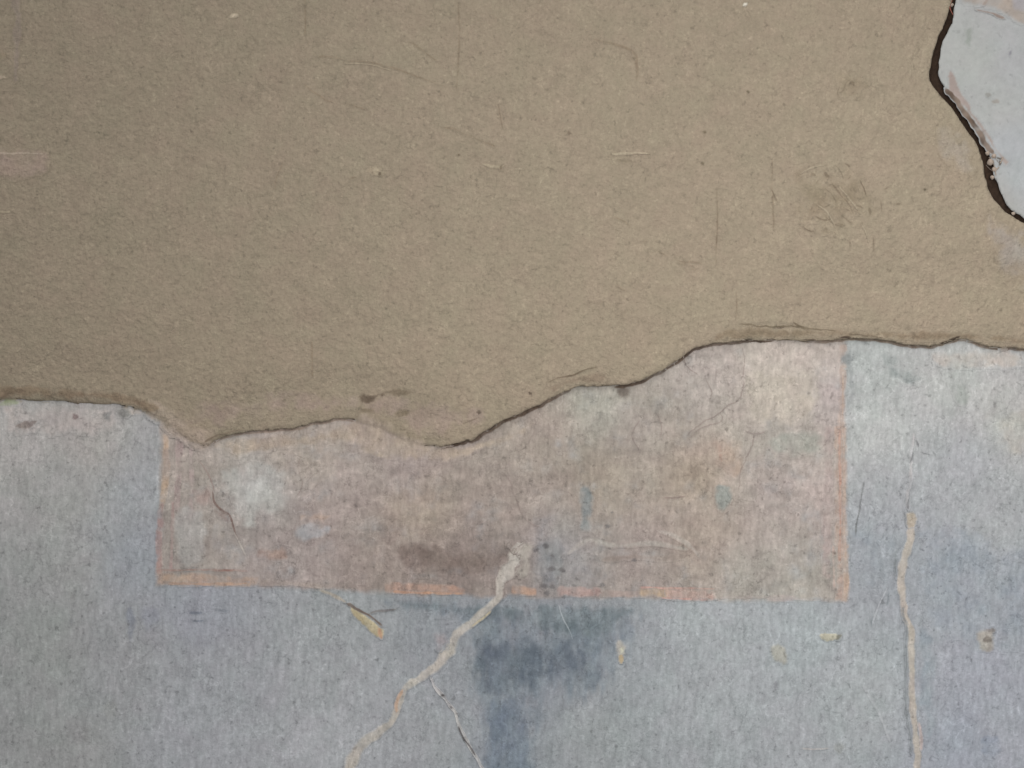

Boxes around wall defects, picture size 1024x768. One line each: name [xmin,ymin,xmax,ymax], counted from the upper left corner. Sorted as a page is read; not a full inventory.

spalling [944,87,1003,167]
spalling [357,388,412,418]
peeling [219,459,292,530]
peeling [172,504,210,569]
spalling [318,589,398,640]
crack [343,472,541,768]
damp [379,534,645,768]
crack [893,432,936,768]